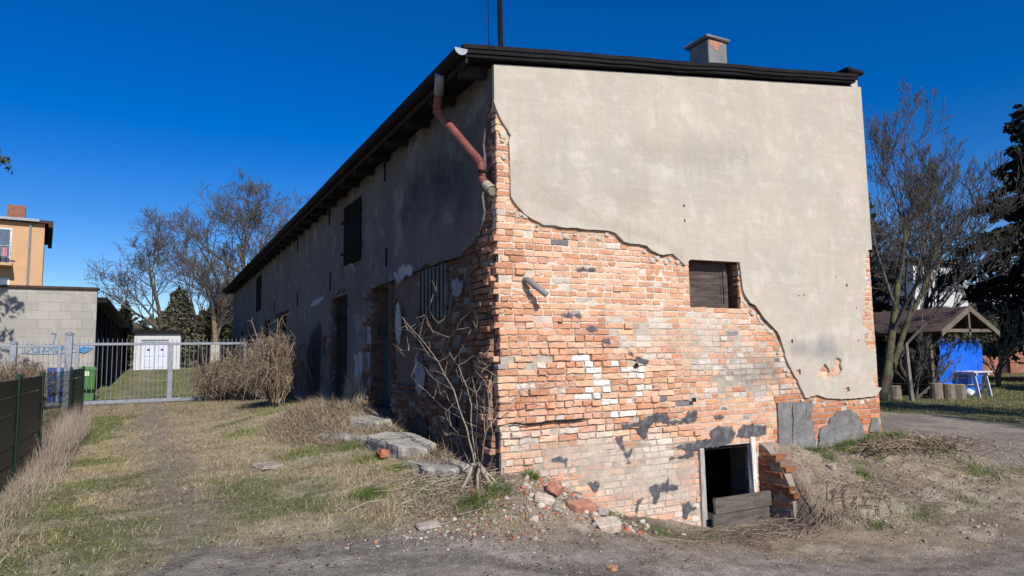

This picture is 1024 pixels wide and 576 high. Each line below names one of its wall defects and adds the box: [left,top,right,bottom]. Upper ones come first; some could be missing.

peeling [352,103,825,526]
peeling [818,358,840,379]
peeling [856,250,878,387]